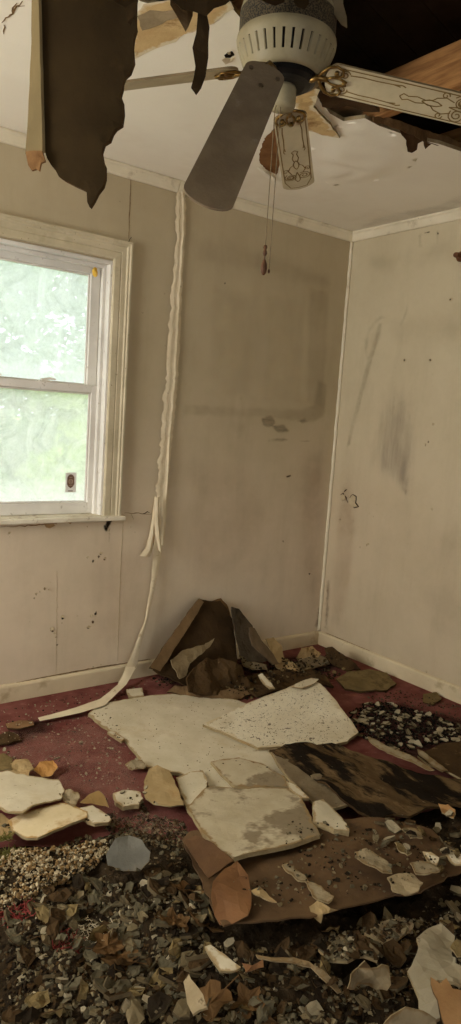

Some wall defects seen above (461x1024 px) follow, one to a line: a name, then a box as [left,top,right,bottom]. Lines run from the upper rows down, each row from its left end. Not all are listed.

crack [2,1,23,34]
peeling [134,0,234,59]
peeling [257,128,280,183]